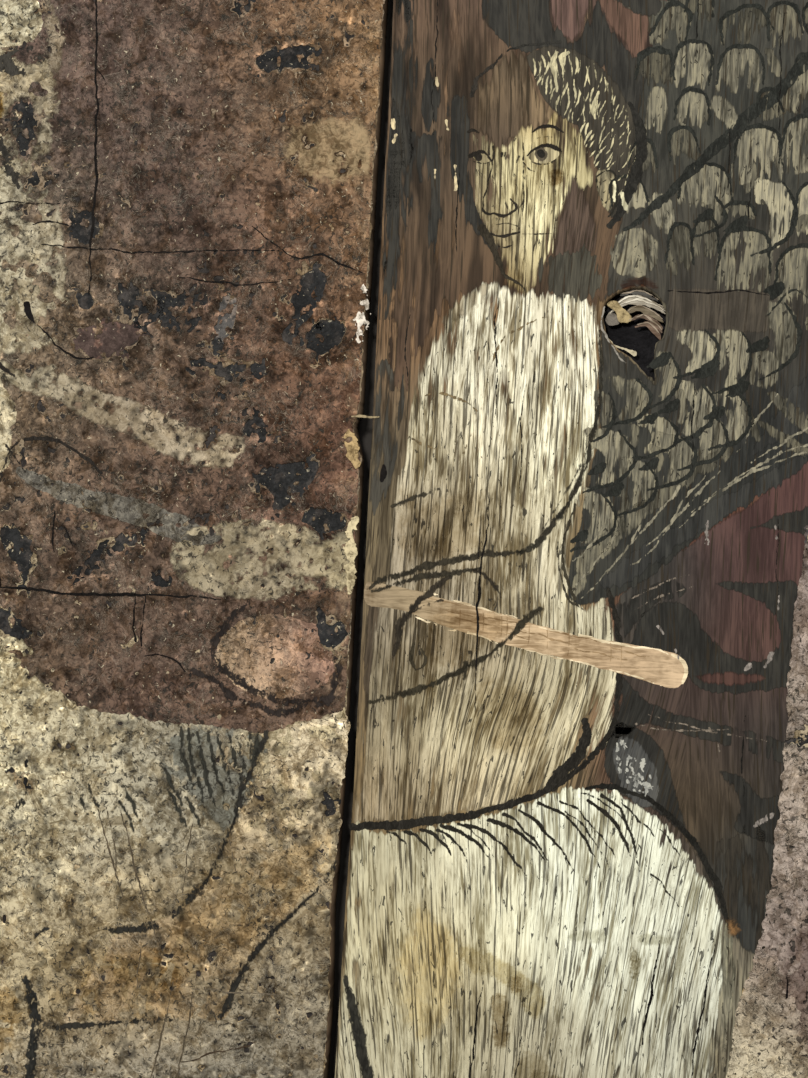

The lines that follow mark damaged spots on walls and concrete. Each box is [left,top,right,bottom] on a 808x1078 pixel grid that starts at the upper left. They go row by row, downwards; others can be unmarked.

peeling [232,0,257,18]
peeling [256,43,329,77]
crack [0,0,362,295]
peeling [280,262,371,362]
peeling [250,454,359,595]
peeling [785,734,808,748]